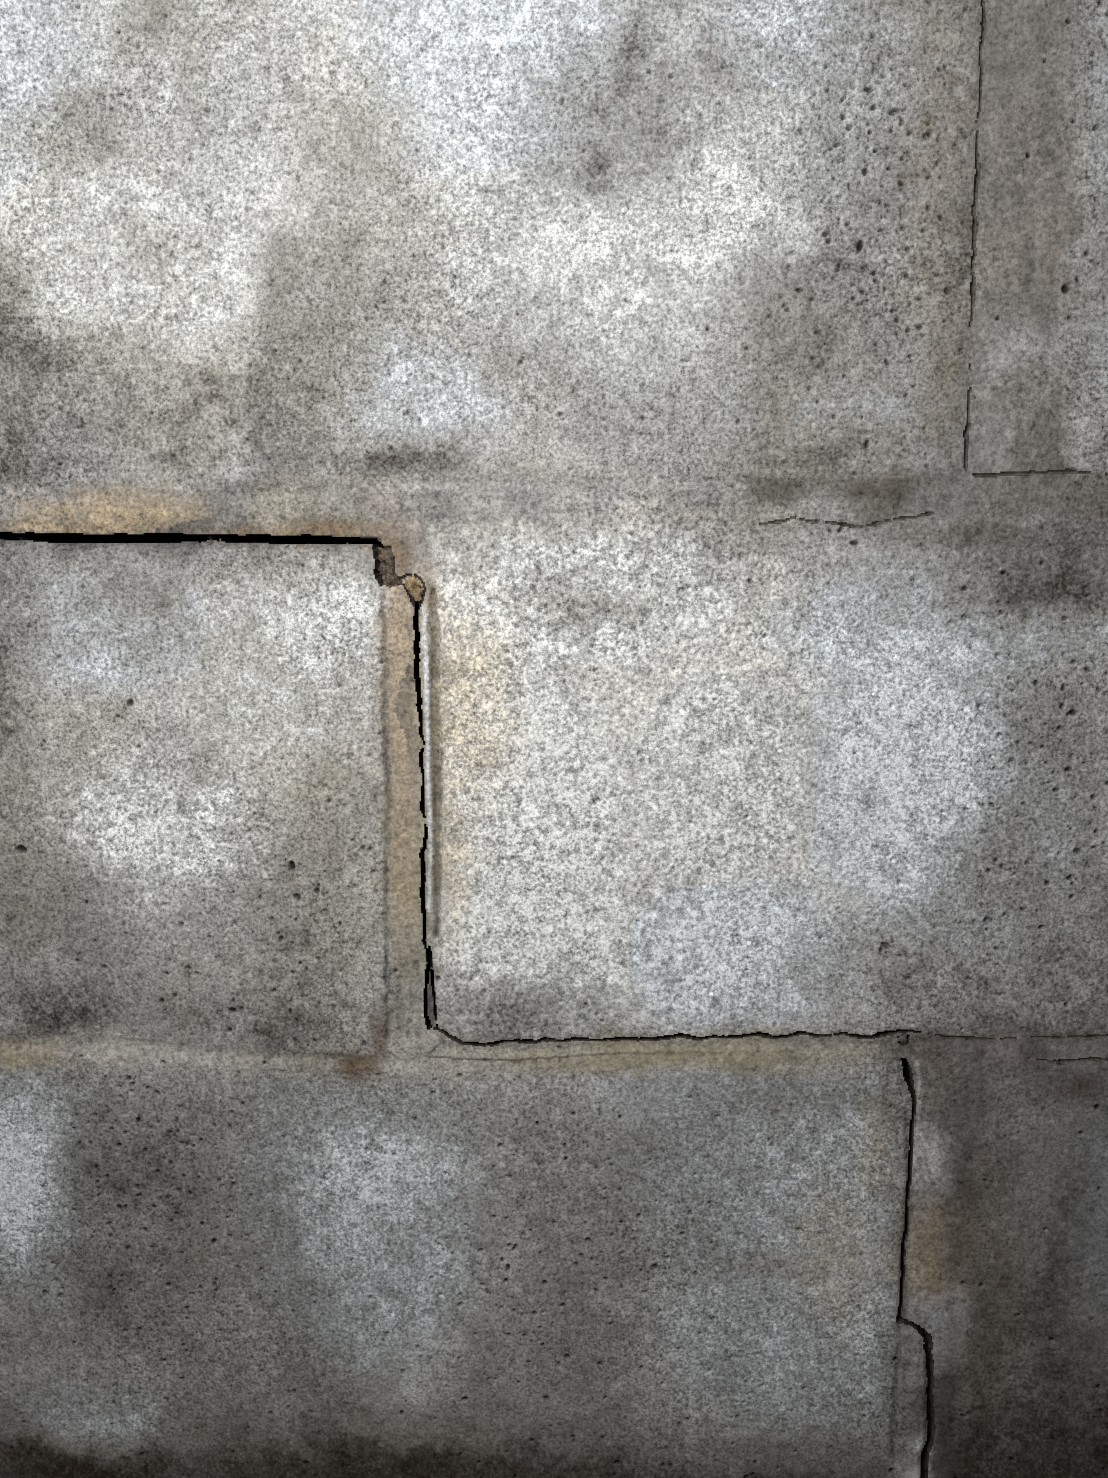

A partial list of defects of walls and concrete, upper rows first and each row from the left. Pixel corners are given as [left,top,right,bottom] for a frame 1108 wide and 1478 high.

crack [968,0,986,327]
crack [759,511,934,528]
crack [963,363,1108,478]
crack [0,532,1108,1478]